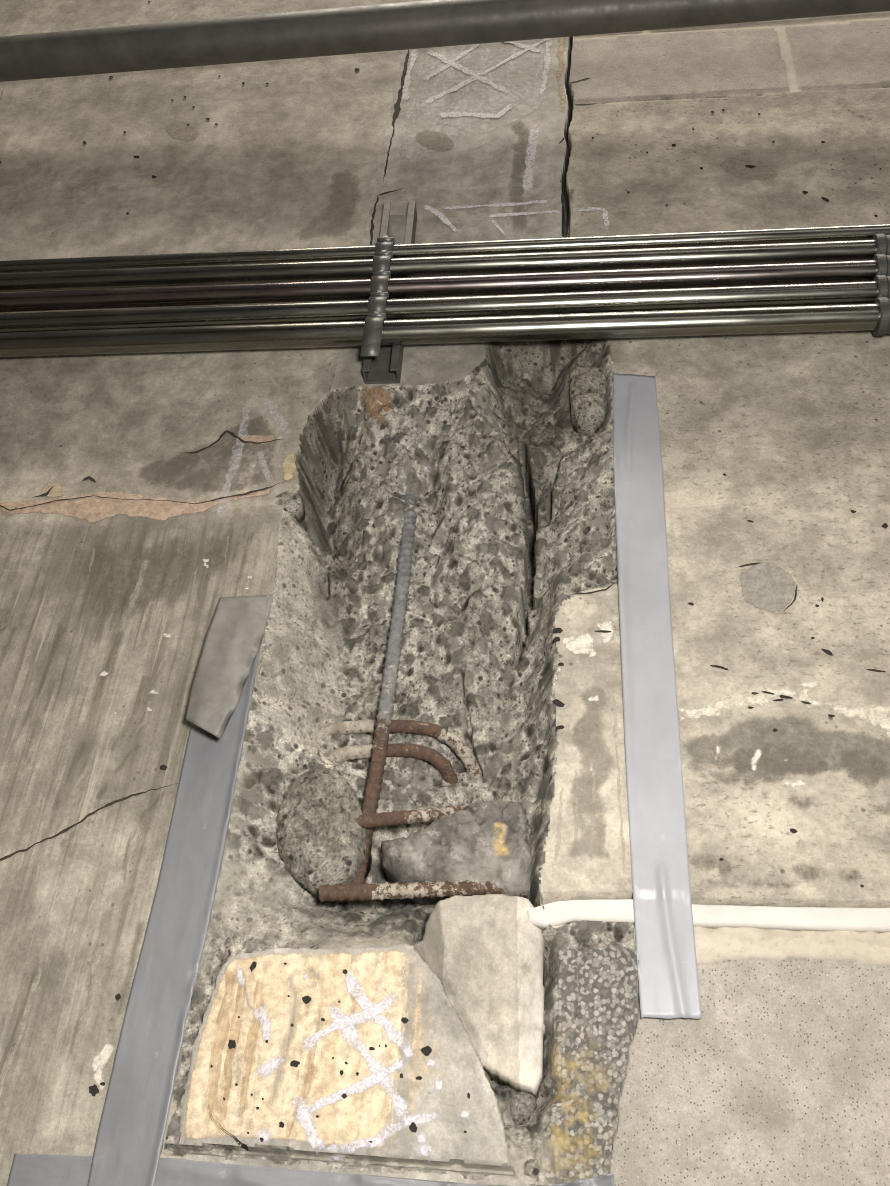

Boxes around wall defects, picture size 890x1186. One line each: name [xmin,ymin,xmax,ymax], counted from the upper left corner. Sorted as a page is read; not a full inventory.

crack [556,36,597,237]
crack [0,783,177,861]
spalling [0,338,639,1186]
leakage [680,682,890,787]